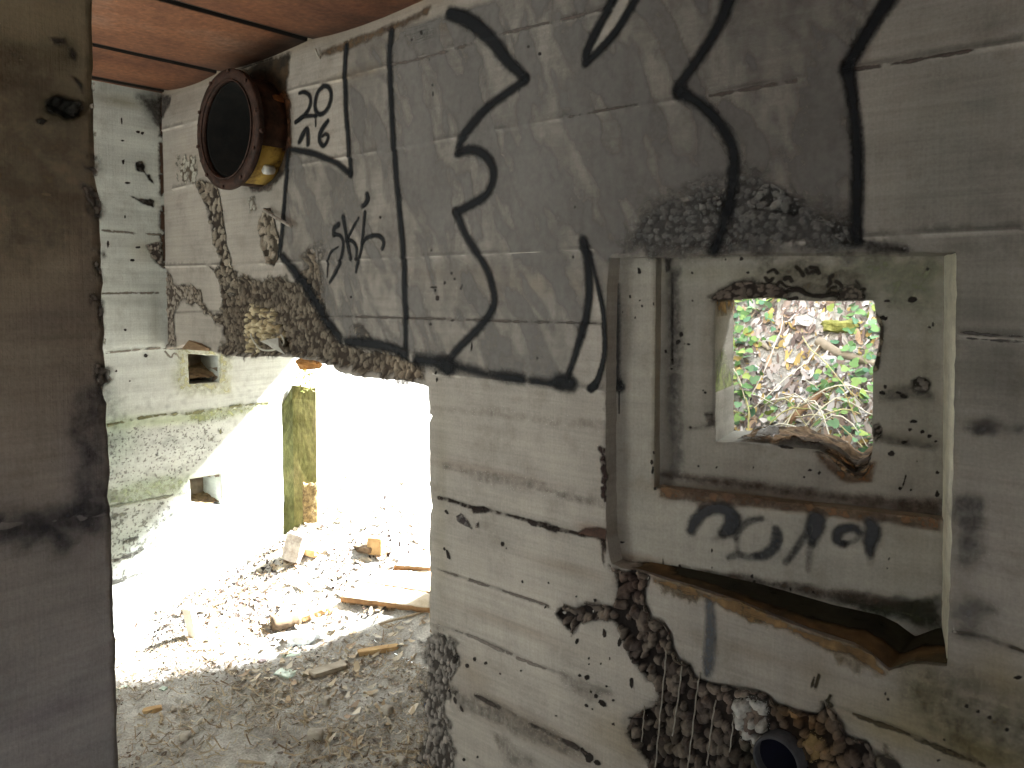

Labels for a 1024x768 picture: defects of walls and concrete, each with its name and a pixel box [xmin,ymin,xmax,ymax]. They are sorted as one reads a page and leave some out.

corrosion [279,92,291,158]
spalling [130,155,438,385]
spalling [627,167,907,302]
water stain [0,477,183,550]
crack [437,496,606,552]
spalling [803,451,875,483]
spalling [415,633,487,768]
spalling [544,565,901,768]